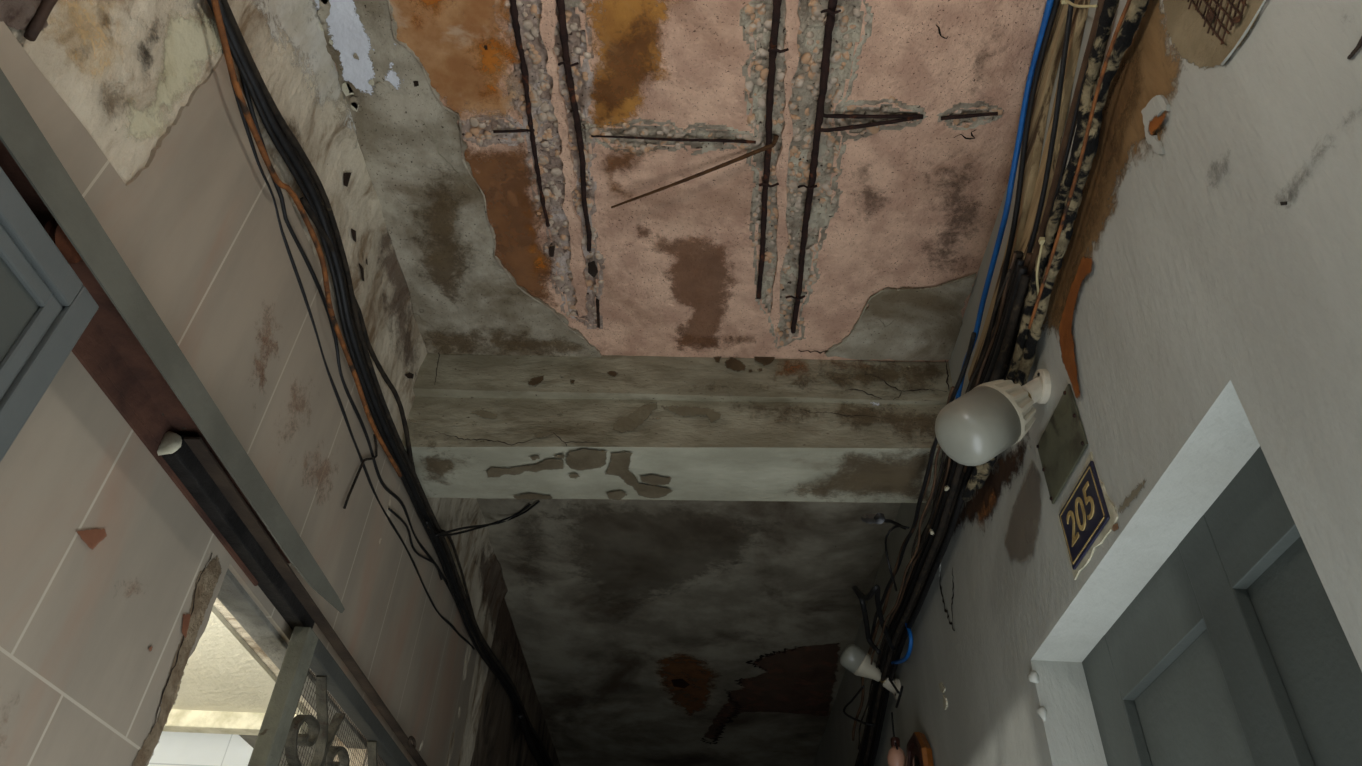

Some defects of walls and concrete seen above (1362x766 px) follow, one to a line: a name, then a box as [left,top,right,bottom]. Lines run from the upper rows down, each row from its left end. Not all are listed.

leakage [141,22,158,76]
corrosion [389,0,519,118]
leakage [379,184,582,366]
corrosion [464,142,557,306]
corrosion [588,261,598,278]
leakage [602,150,641,194]
corrosion [586,0,669,128]
flaking render [312,0,1004,372]
leakage [637,227,752,350]
peeling [1141,95,1170,154]